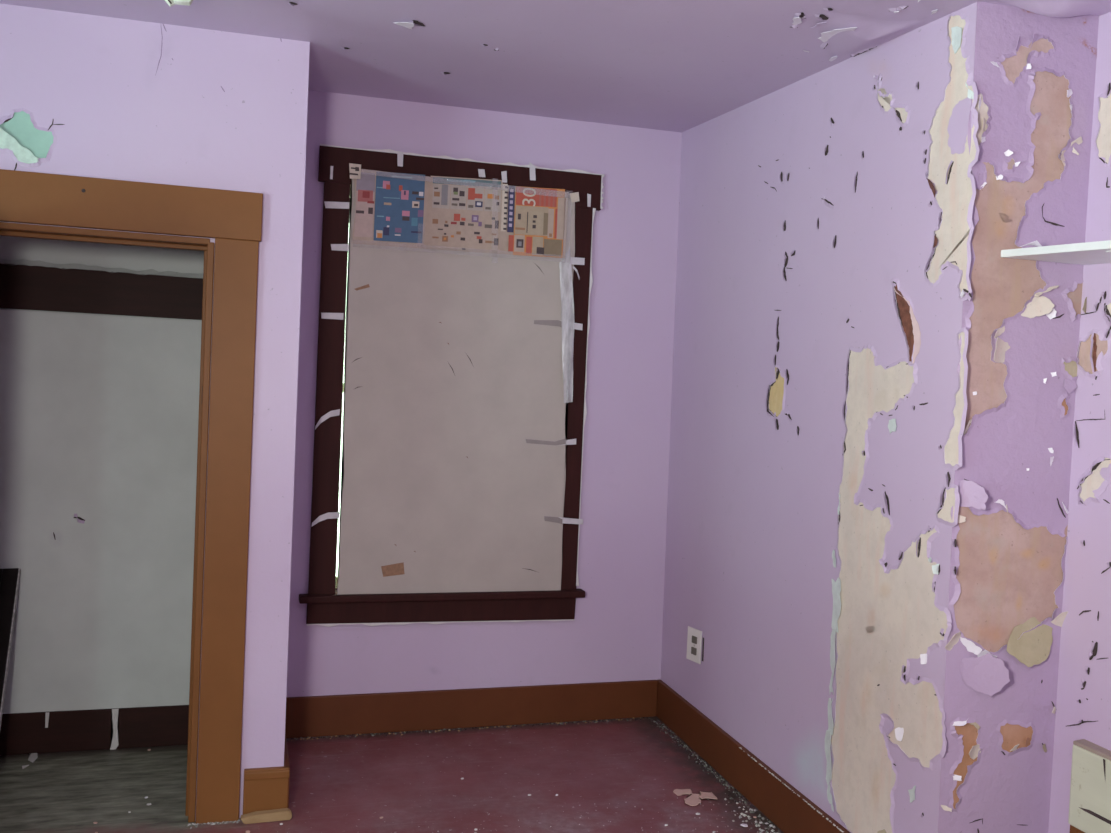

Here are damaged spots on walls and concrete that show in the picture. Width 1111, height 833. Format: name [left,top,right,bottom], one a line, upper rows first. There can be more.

peeling [791,8,857,61]
peeling [769,364,786,420]
peeling [825,9,1111,833]